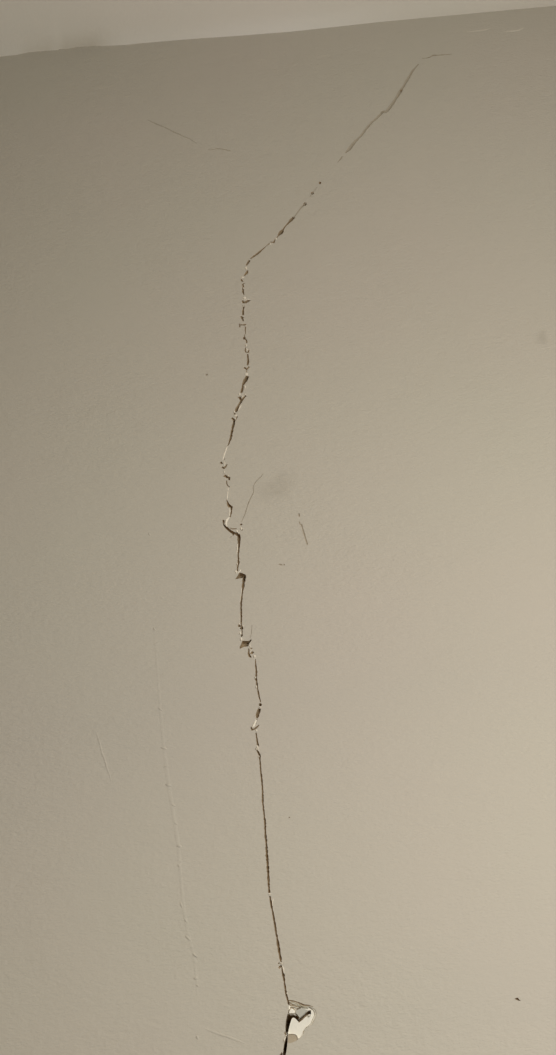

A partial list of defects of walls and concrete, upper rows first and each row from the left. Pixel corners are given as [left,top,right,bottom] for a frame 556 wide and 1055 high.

crack [337,54,451,163]
crack [220,182,321,1055]
spalling [280,1000,316,1055]